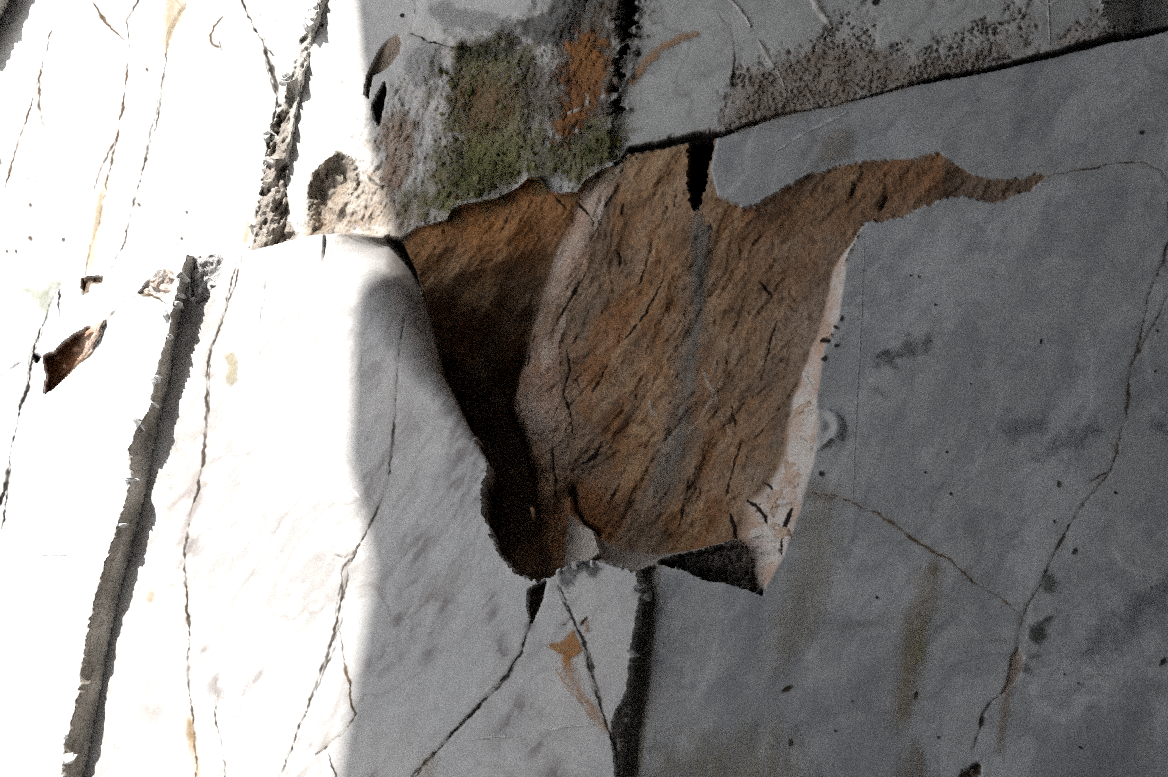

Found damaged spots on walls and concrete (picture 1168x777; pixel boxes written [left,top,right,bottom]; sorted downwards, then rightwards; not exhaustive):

crack [209,0,278,167]
water stain [404,41,444,86]
water stain [428,0,633,178]
rust [554,31,615,141]
crack [0,291,115,528]
spalling [45,320,106,394]
spalling [61,254,224,777]
crack [183,259,266,777]
spalling [402,138,1049,777]
crack [283,503,380,777]
crack [414,586,617,777]
rust [550,626,588,681]